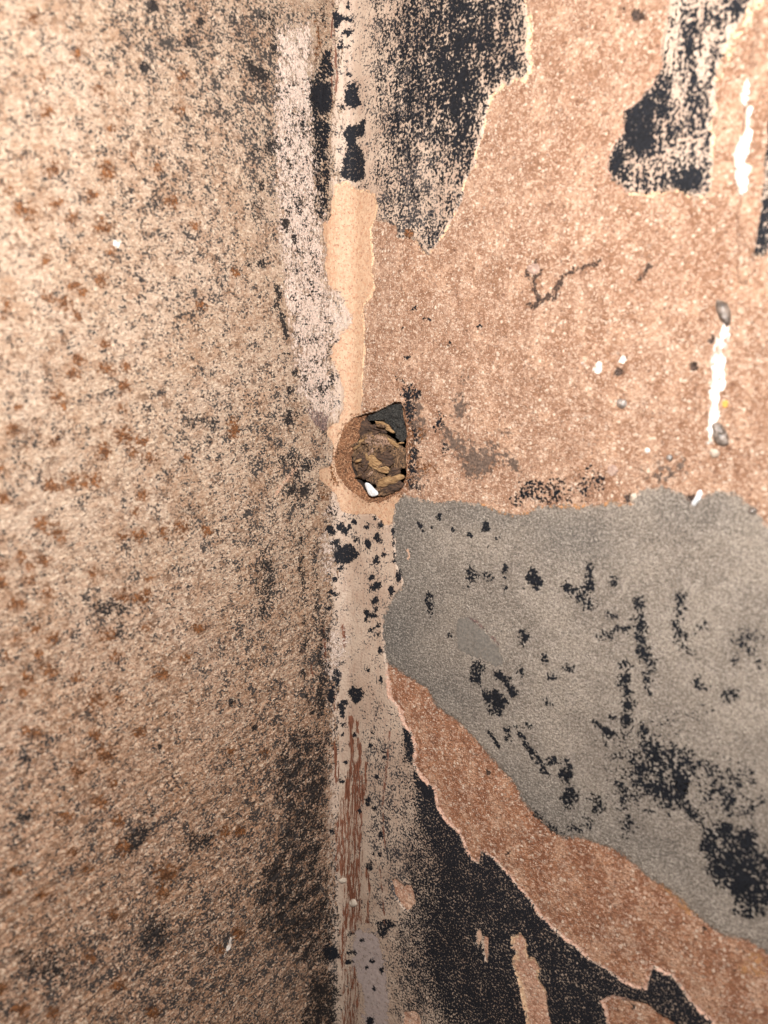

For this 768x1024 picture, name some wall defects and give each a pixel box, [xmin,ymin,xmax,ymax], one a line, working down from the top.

peeling [308,0,768,525]
damp [607,0,750,199]
damp [273,453,316,505]
rust [333,715,371,1024]
damp [253,500,713,1024]
peeling [385,662,768,1024]